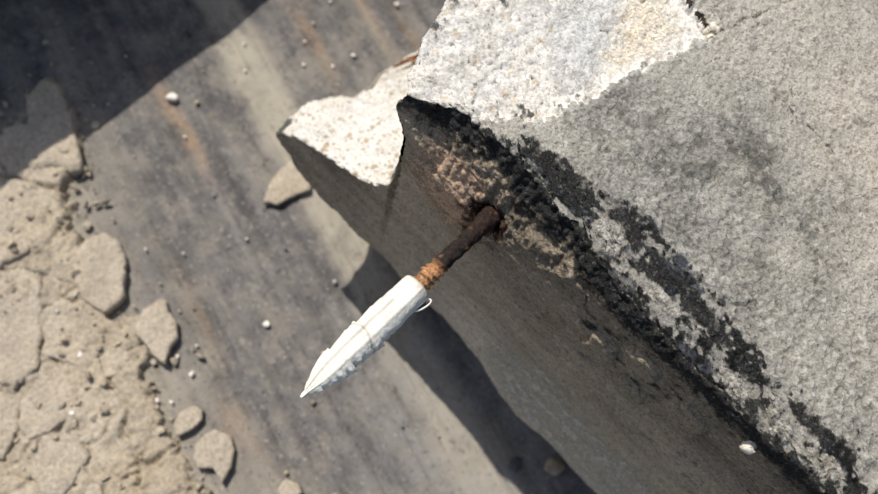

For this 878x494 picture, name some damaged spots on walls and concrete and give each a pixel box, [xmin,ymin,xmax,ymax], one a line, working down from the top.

spalling [276,0,711,186]
crack [686,0,787,39]
rust [458,199,506,251]
leakage [396,96,878,494]